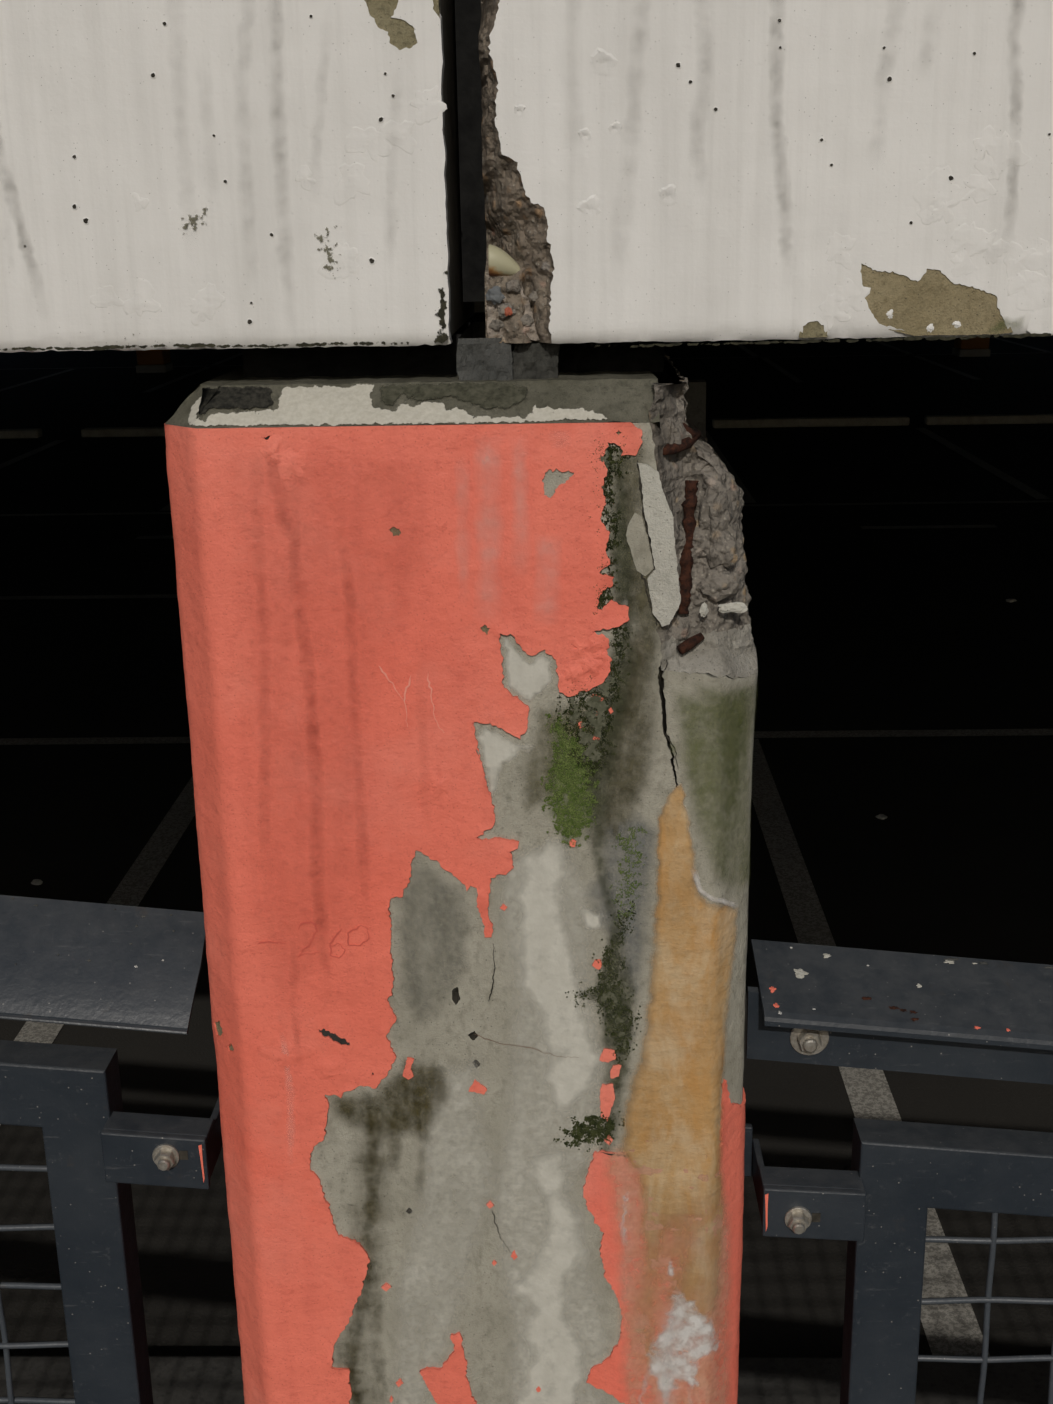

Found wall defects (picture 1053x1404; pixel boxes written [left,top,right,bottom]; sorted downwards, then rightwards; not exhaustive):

peeling [364,0,417,50]
spalling [479,0,555,344]
peeling [799,321,828,338]
peeling [860,264,1013,336]
crack [637,460,657,626]
crack [658,660,678,787]
peeling [310,352,758,1404]
corrosion [611,785,737,1404]
efflorescence [651,1298,717,1394]